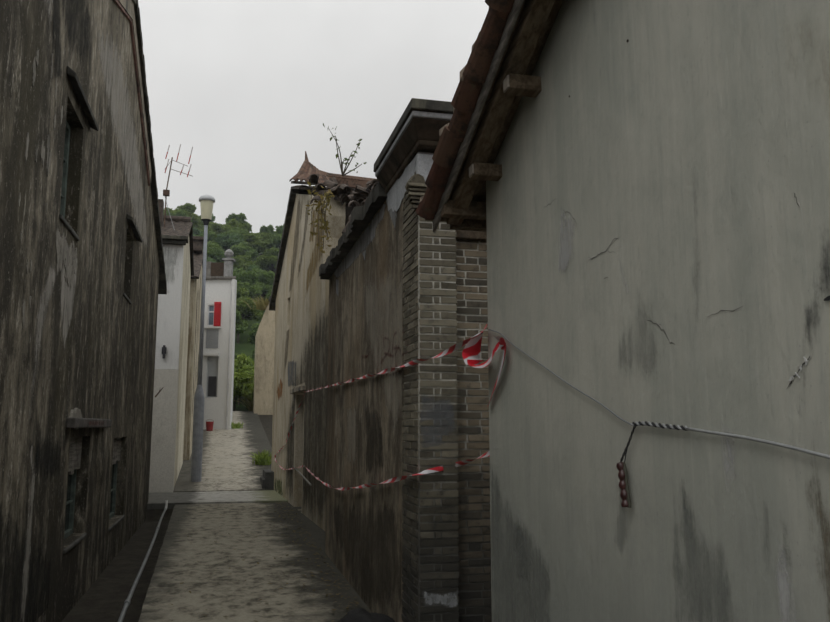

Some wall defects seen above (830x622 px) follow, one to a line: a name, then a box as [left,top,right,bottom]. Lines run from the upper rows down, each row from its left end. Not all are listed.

leakage [53,0,90,77]
leakage [36,259,77,353]
crack [788,356,812,387]
leakage [0,439,61,622]